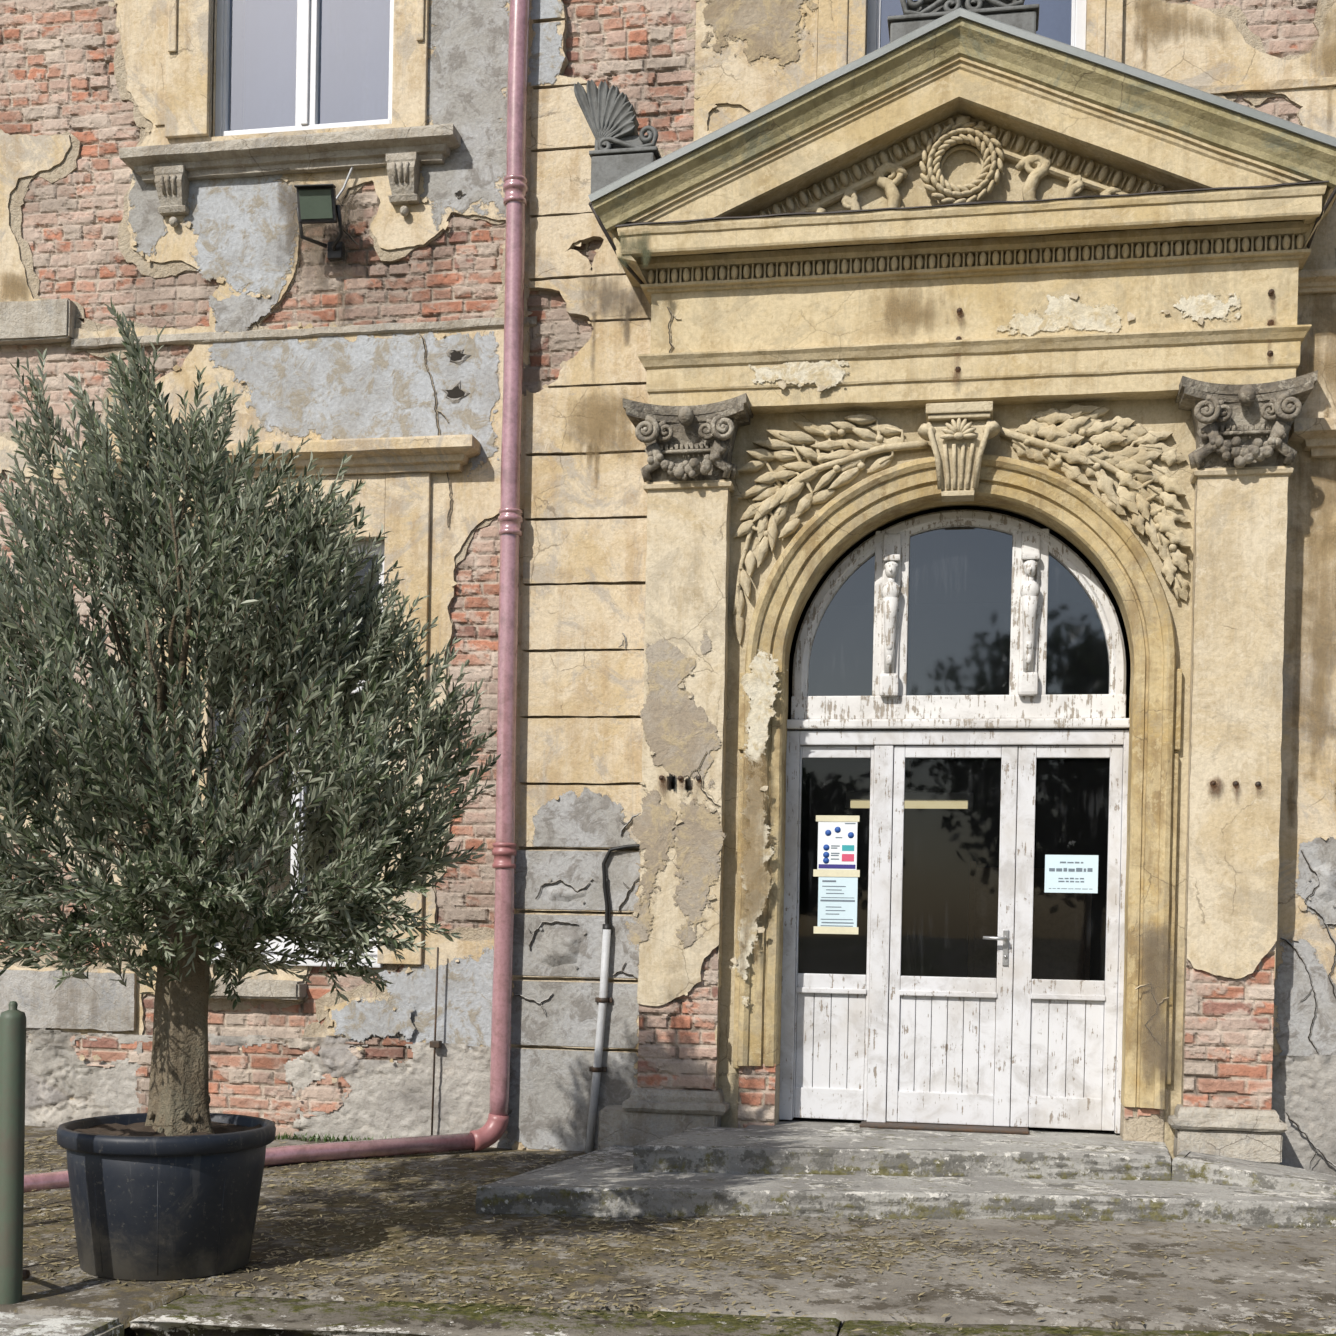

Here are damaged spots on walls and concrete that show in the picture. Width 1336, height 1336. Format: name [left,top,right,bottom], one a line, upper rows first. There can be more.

flaking render [527,0,819,155]
flaking render [1165,0,1319,58]
flaking render [0,0,510,477]
flaking render [574,240,603,266]
flaking render [522,290,594,396]
flaking render [435,515,500,932]
flaking render [208,946,494,1137]
peeling [504,629,781,1151]
flaking render [1183,936,1336,1110]
crack [1280,850,1336,1055]
peeling [1294,834,1336,928]
crack [1286,1112,1336,1169]